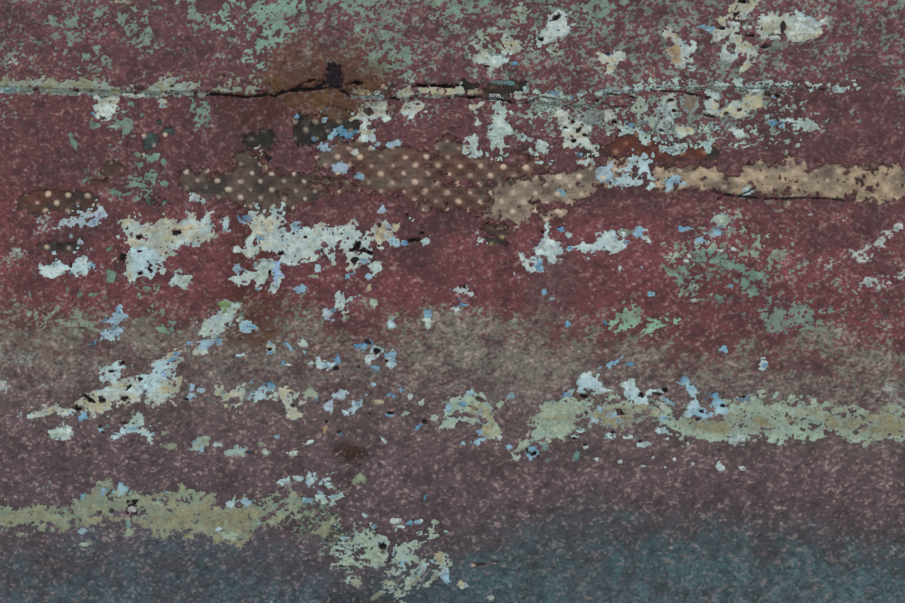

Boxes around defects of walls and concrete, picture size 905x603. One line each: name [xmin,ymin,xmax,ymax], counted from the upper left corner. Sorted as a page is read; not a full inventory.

crack [168,75,362,99]
crack [391,84,480,100]
crack [600,89,698,108]
spalling [0,0,905,462]
peeling [0,470,470,603]